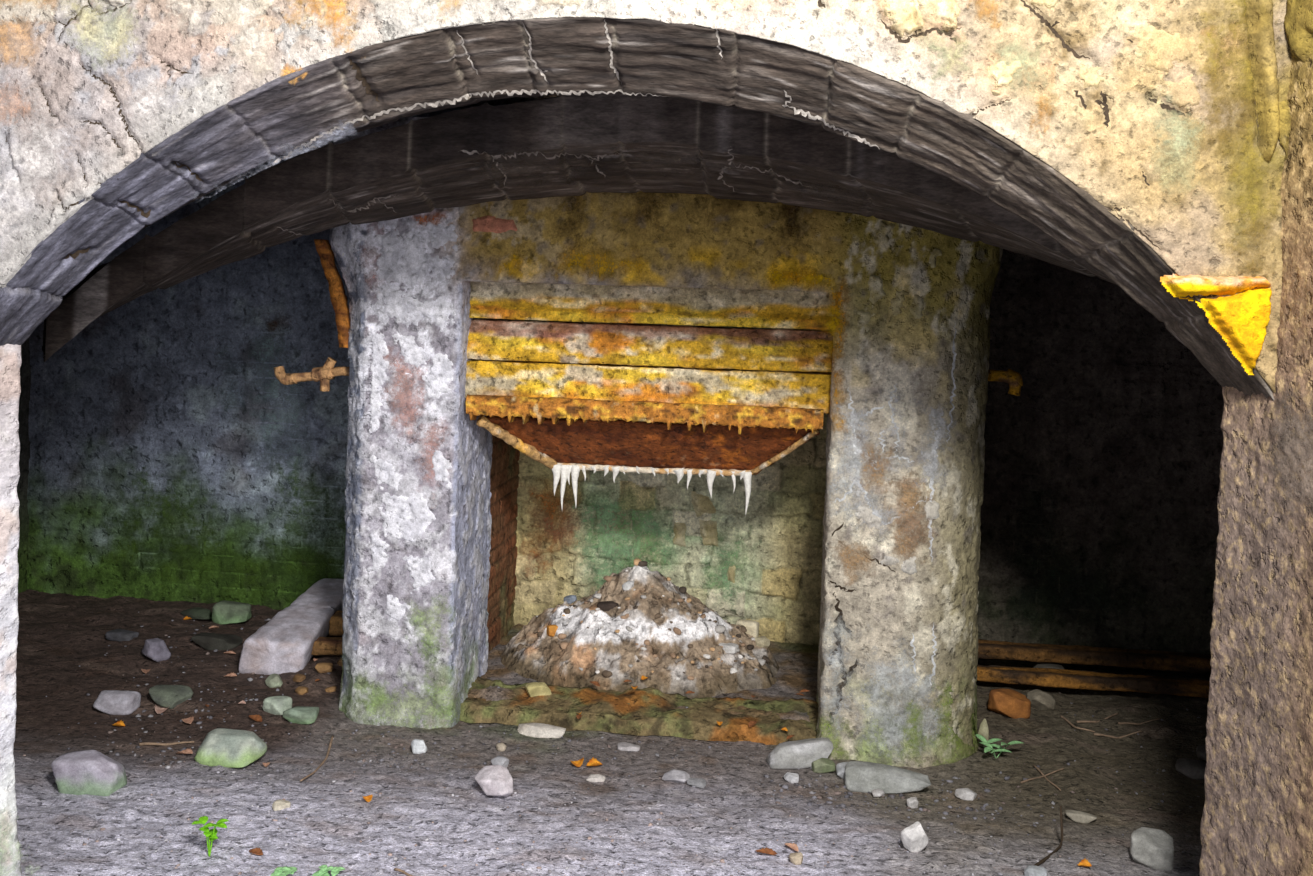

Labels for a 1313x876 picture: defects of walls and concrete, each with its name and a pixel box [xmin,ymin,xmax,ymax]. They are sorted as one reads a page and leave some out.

crack [53,0,130,43]
crack [156,56,190,78]
crack [522,22,549,84]
crack [604,19,622,84]
crack [1021,0,1090,59]
crack [38,64,142,153]
crack [1074,90,1110,128]
crack [1149,98,1186,117]
leakage [1205,0,1275,243]
crack [58,157,151,218]
rust [466,268,847,435]
crack [828,580,858,724]